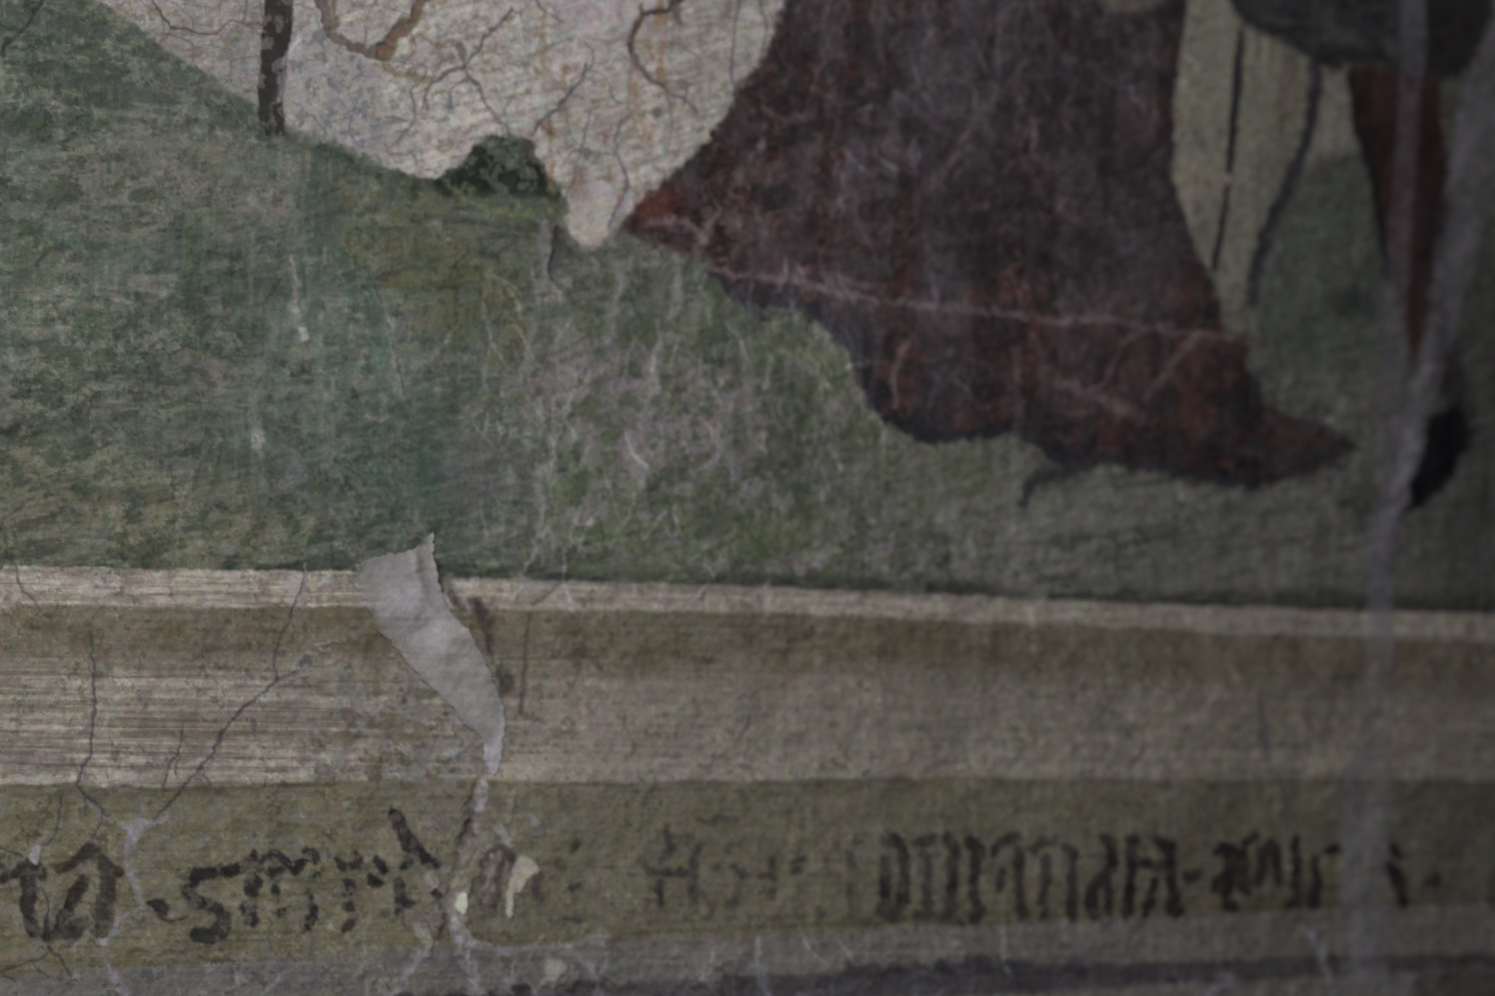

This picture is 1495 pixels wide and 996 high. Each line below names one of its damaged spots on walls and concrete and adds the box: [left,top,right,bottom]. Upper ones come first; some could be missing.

crack [313,0,771,238]
crack [0,630,112,984]
crack [152,561,309,823]
spalling [289,638,374,719]
flaking render [323,533,546,960]